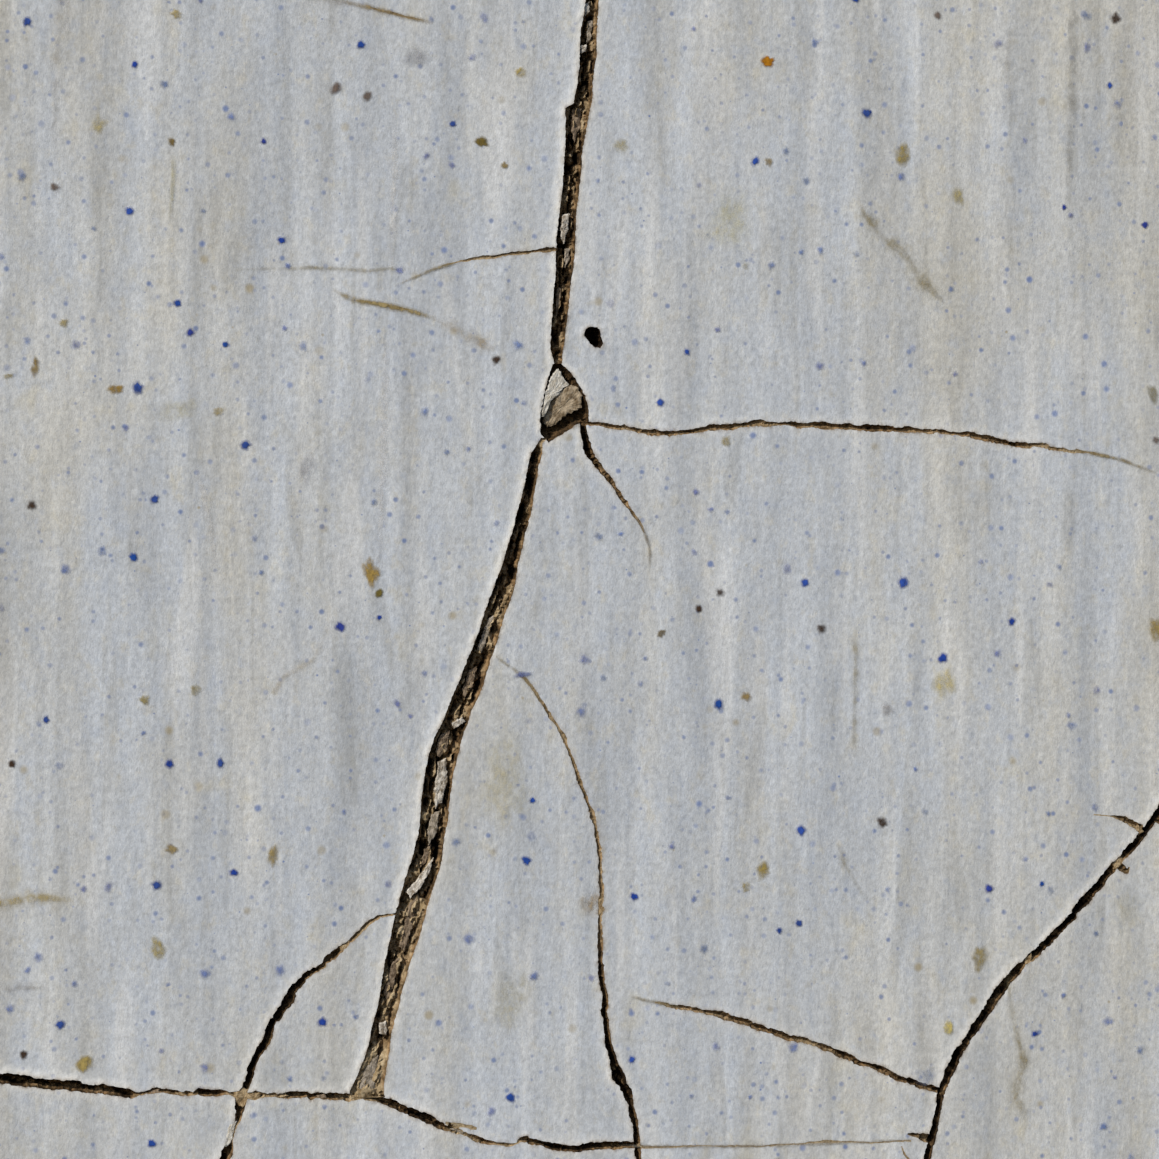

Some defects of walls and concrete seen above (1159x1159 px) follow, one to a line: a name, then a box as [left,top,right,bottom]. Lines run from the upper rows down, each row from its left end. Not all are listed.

crack [342,294,425,316]
crack [363,5,423,21]
crack [416,0,605,365]
crack [0,415,1159,1159]